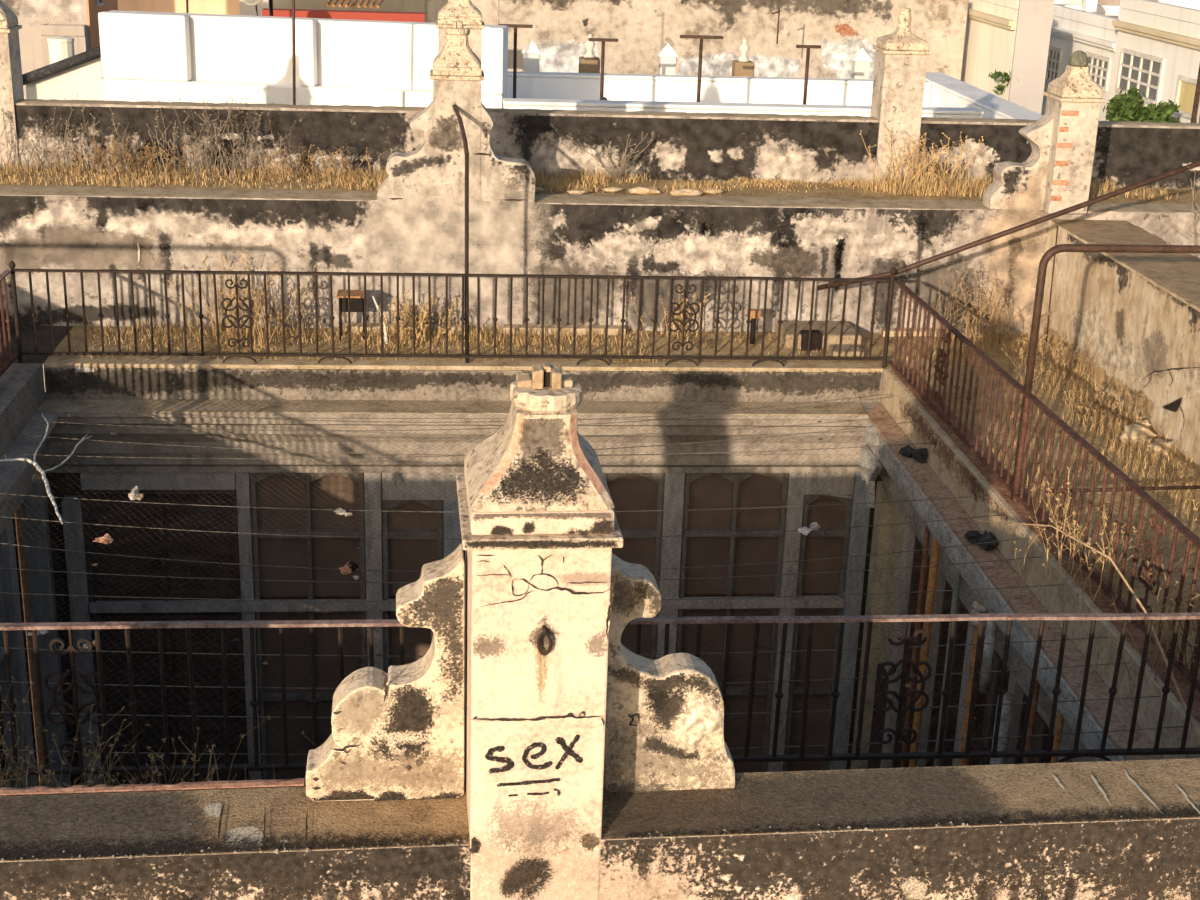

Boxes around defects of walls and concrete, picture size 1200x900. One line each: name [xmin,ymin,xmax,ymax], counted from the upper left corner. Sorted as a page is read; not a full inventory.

peeling [822,24,876,79]
water stain [482,115,1154,419]
water stain [464,419,618,549]
crack [477,554,616,642]
water stain [371,573,463,770]
water stain [608,666,724,761]
water stain [0,791,481,900]
water stain [579,766,1200,900]